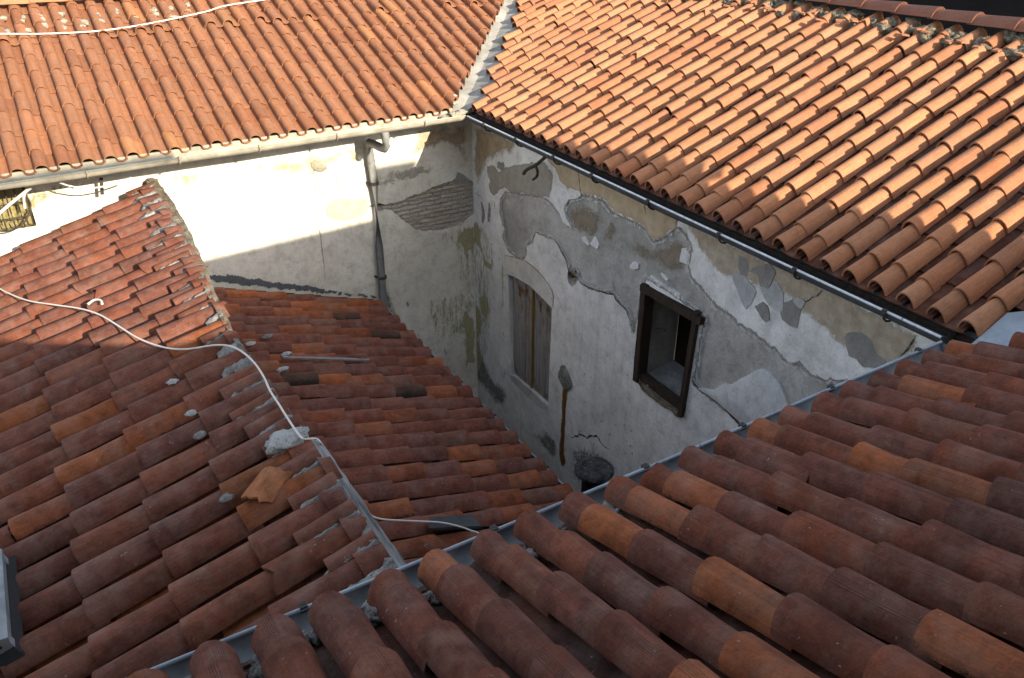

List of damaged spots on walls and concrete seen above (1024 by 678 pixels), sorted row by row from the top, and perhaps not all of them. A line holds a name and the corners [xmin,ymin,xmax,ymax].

flaking render [377,172,474,231]
water stain [431,228,505,402]
peeling [499,191,846,422]
rust [559,388,568,466]
crack [571,431,607,448]